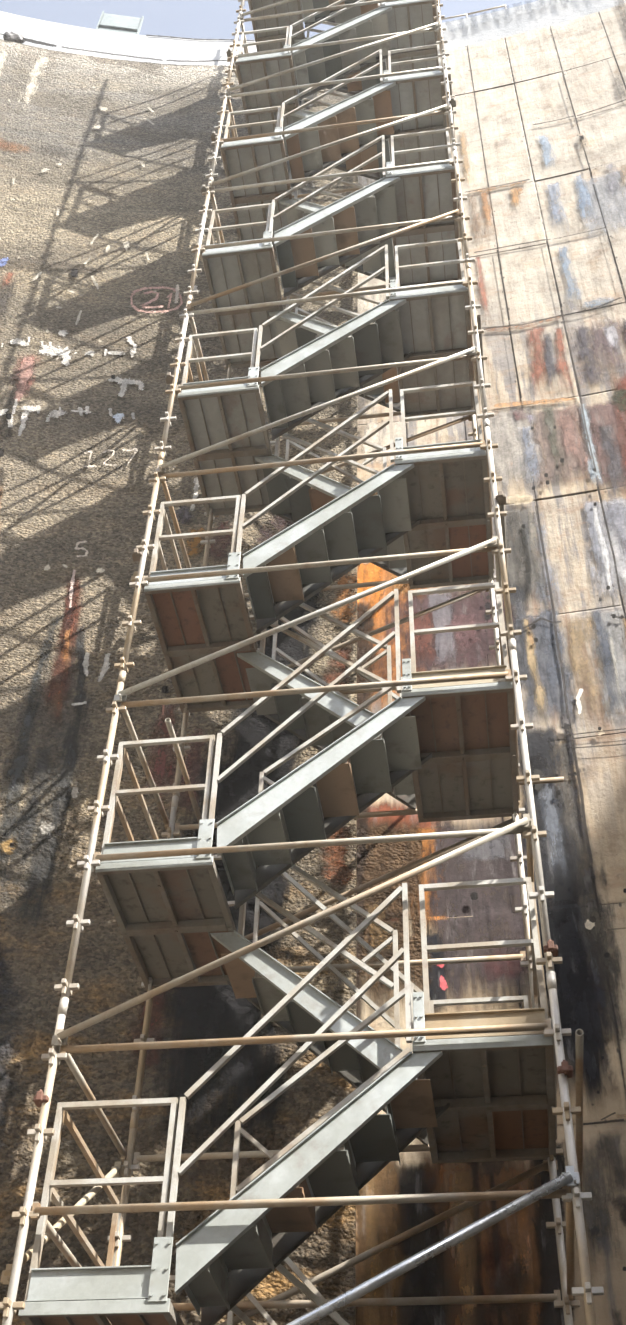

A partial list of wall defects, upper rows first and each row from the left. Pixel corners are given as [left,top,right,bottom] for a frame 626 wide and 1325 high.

corrosion [476,257,488,310]
corrosion [488,316,626,485]
water stain [571,321,626,381]
corrosion [47,569,81,713]
water stain [0,617,111,925]
water stain [356,396,626,1096]